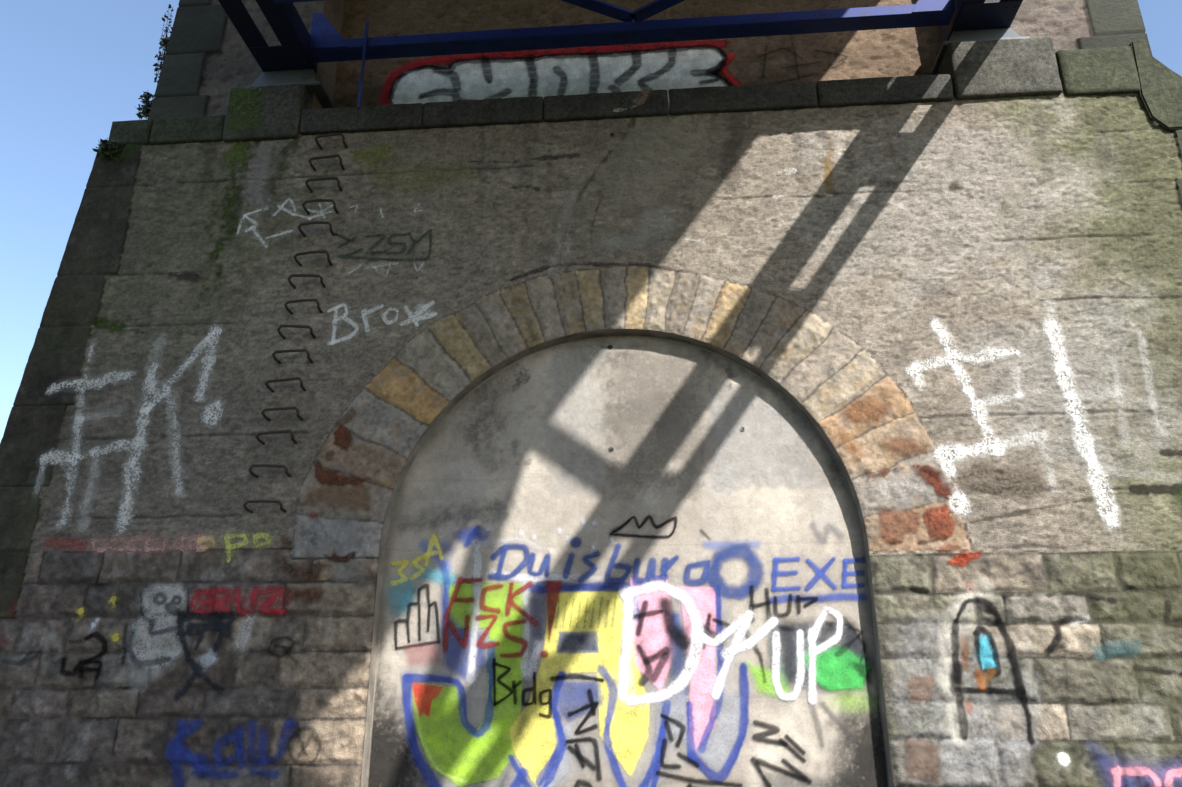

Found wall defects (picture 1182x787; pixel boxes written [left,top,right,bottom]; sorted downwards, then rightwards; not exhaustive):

crack [471,90,685,291]